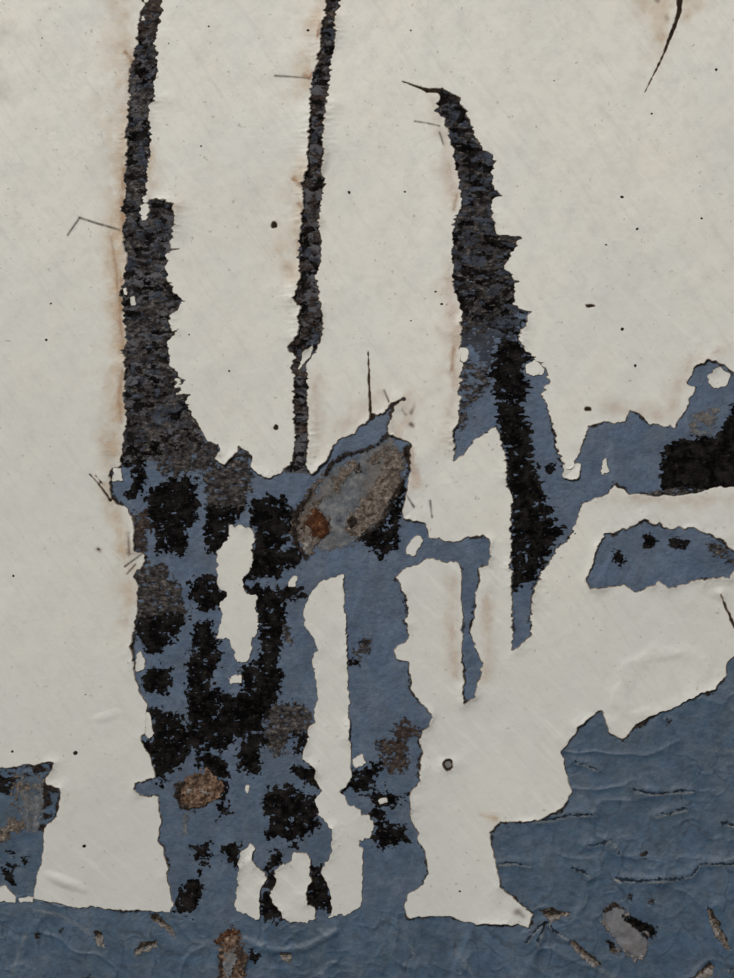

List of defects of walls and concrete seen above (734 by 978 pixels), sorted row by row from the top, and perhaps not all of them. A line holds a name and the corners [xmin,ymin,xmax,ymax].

peeling [120,0,205,466]
peeling [284,0,341,474]
peeling [435,90,734,650]
crack [649,0,682,84]
peeling [0,397,734,978]